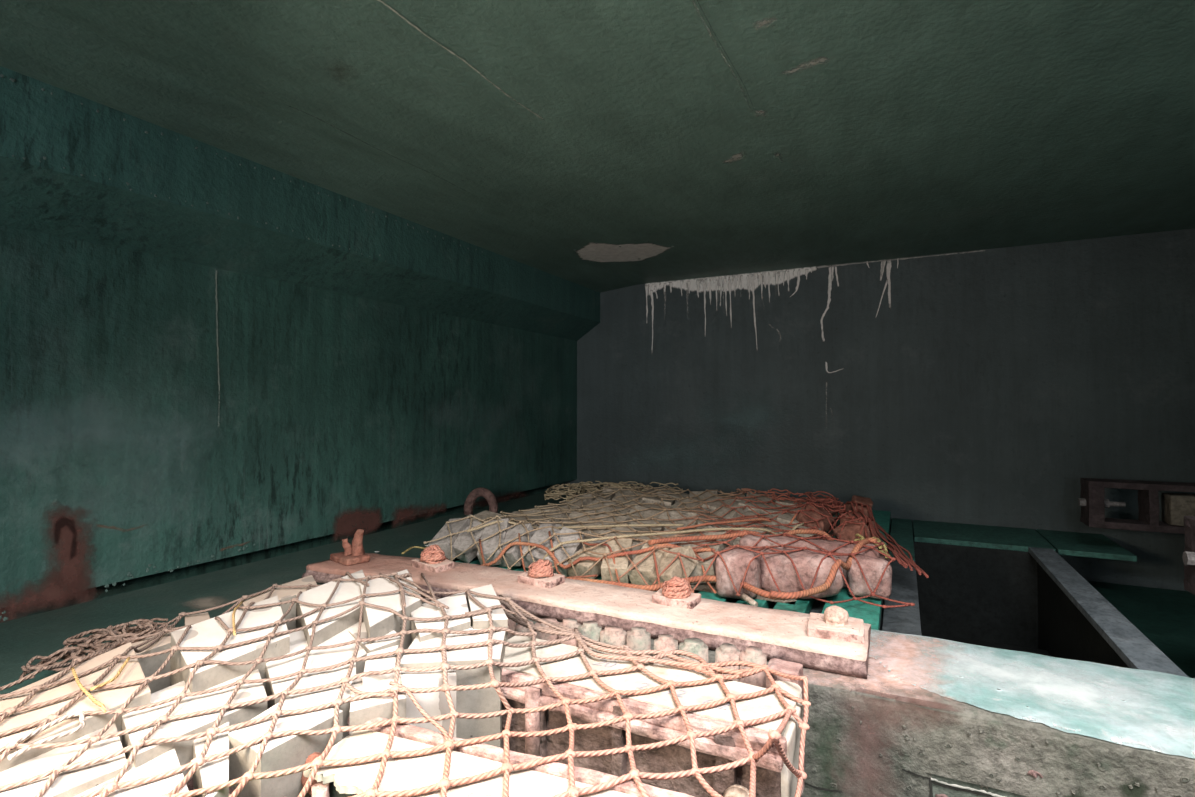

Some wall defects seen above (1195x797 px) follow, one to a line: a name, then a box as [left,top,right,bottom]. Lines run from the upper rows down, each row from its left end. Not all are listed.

efflorescence [645,265,839,349]
rust [335,505,445,539]
rust [0,509,90,621]